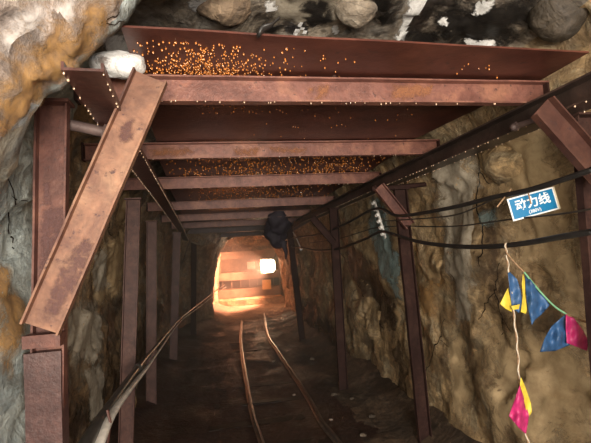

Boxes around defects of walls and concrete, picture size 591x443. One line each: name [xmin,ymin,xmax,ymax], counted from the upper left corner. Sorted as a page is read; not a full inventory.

rust [120,121,134,142]
rust [45,191,130,314]
crack [478,263,510,352]